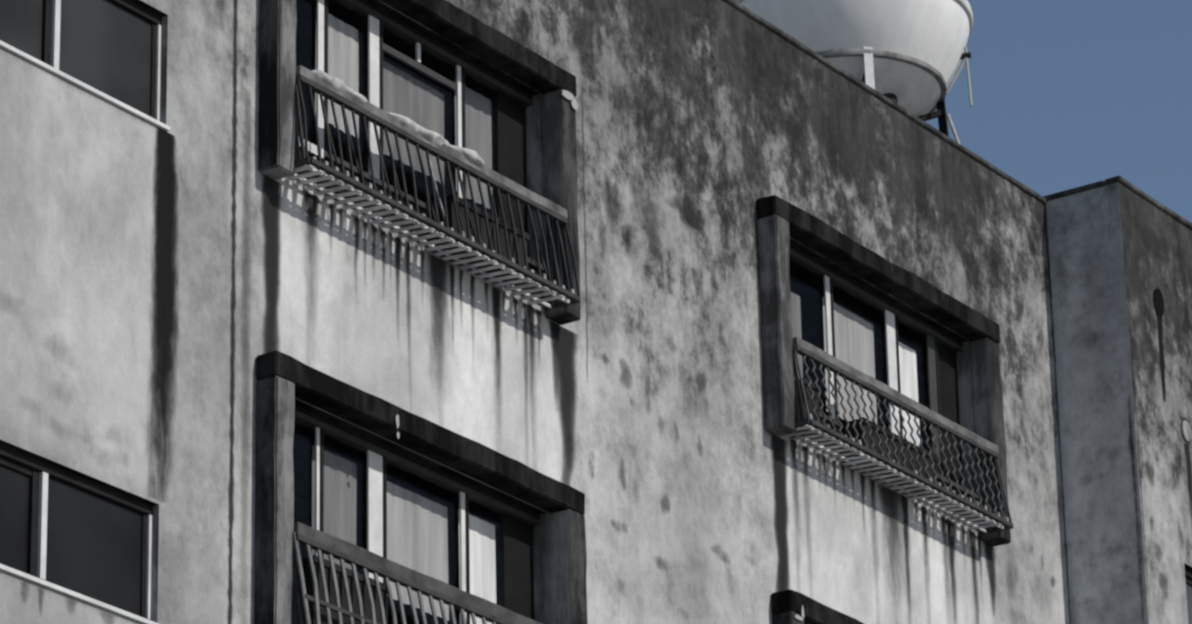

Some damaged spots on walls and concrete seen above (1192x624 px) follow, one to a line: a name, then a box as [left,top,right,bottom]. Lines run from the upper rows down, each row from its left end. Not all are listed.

damp [152,128,178,484]
damp [304,190,576,485]
damp [1156,312,1166,402]
damp [772,434,996,601]